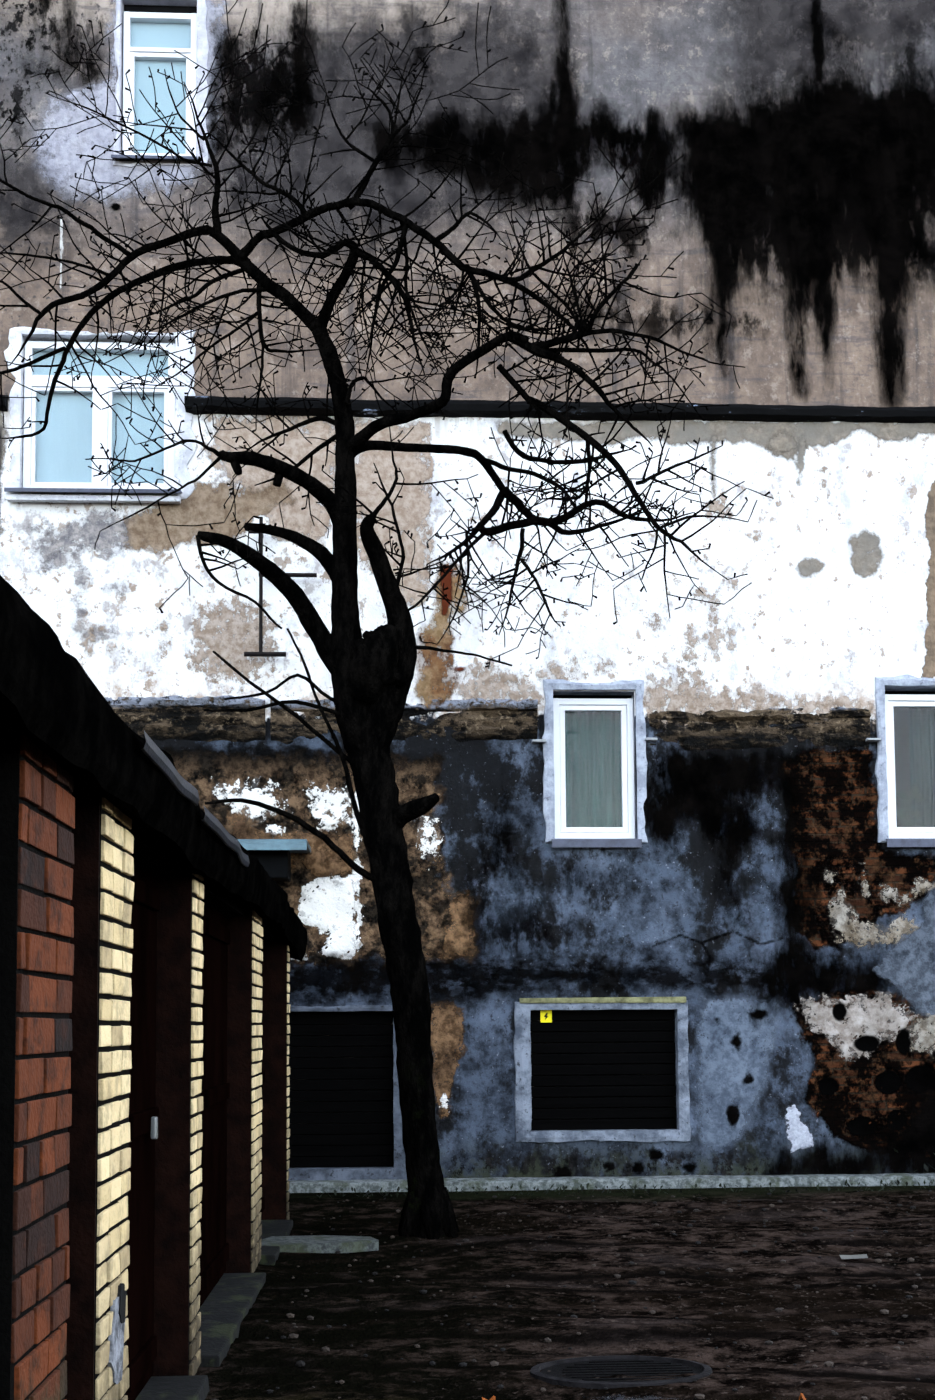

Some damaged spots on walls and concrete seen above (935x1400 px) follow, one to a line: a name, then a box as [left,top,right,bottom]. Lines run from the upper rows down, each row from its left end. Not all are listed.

damp [0,0,100,136]
damp [208,4,319,153]
damp [372,0,935,496]
peeling [28,415,336,656]
peeling [355,419,434,607]
flaking render [164,741,386,967]
damp [289,954,390,1006]
flaking render [390,750,480,962]
damp [425,747,888,1021]
damp [448,1073,935,1178]
flaking render [784,746,935,951]
flaking render [785,989,935,1153]